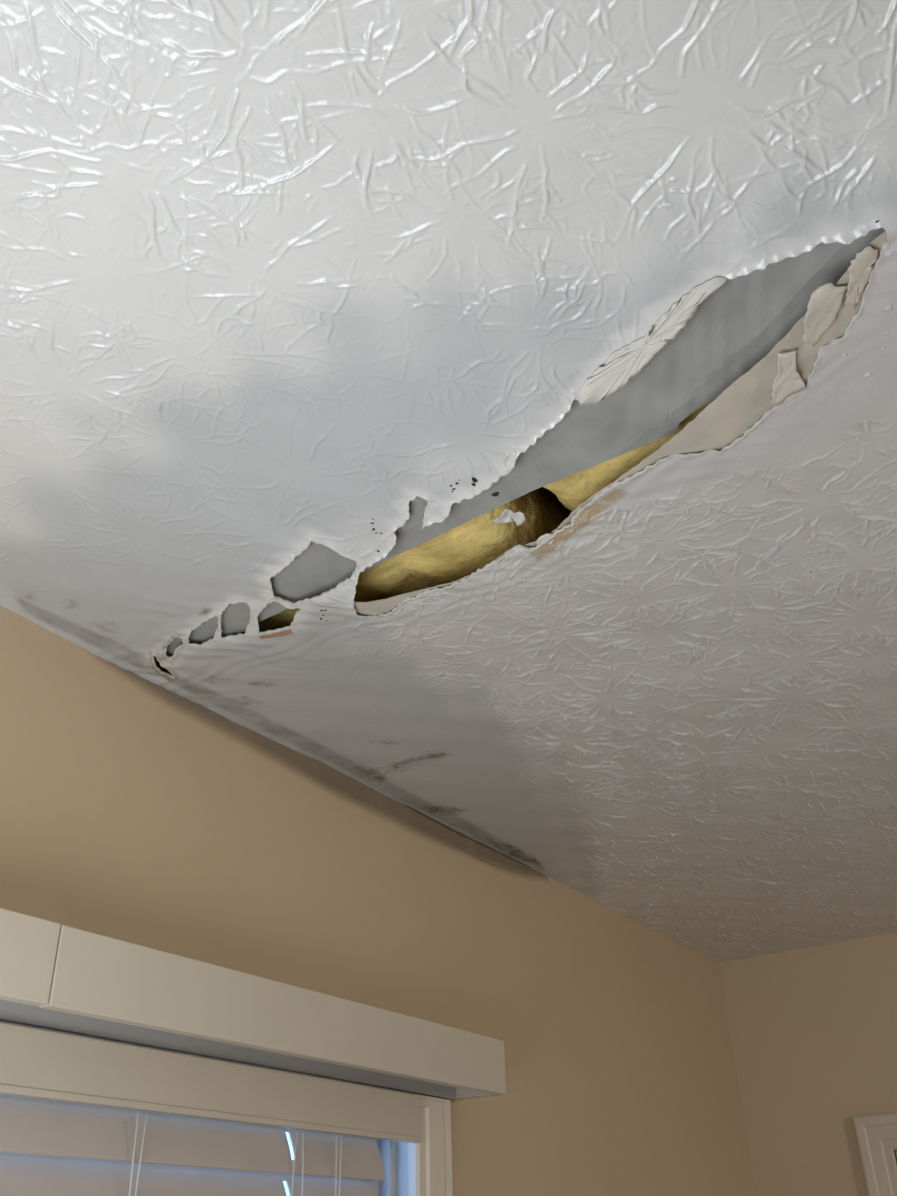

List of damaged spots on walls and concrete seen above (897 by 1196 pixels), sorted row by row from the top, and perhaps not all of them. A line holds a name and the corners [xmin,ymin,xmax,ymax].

water stain [126,670,544,875]